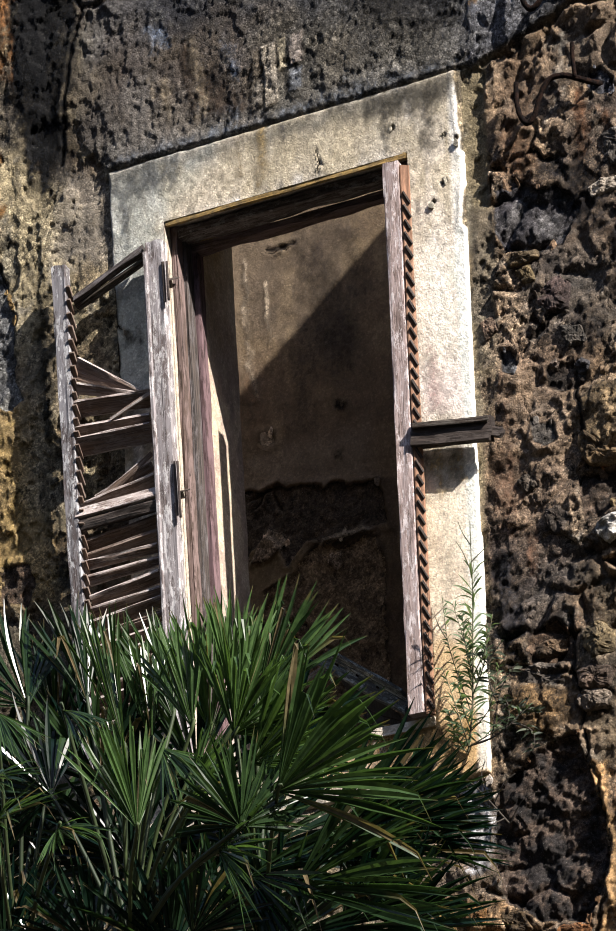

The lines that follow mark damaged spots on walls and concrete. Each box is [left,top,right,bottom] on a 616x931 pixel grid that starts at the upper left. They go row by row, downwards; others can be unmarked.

corrosion [0,0,12,55]
water stain [10,0,79,205]
spalling [587,65,615,94]
spalling [494,178,579,253]
peeling [0,272,24,412]
spalling [501,348,517,375]
spalling [546,358,587,391]
spalling [531,416,556,446]
spalling [578,467,616,527]
peeling [245,476,392,682]
spalling [526,619,575,665]
spalling [450,729,610,924]